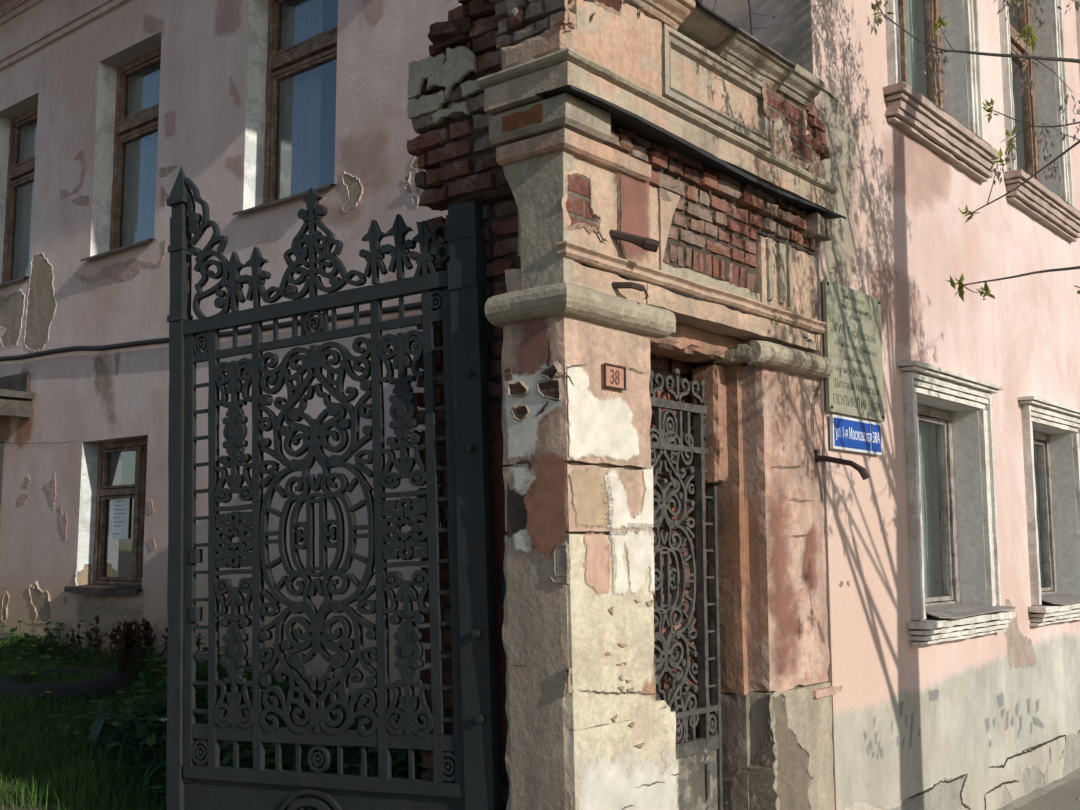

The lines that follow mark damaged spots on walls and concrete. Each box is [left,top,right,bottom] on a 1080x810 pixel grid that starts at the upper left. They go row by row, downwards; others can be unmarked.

peeling [407,46,482,124]
flaking render [762,80,815,168]
flaking render [562,169,601,234]
peeling [0,252,57,352]
peeling [504,361,655,606]
peeling [75,562,93,586]
damp [724,491,803,674]
damp [804,529,817,589]
peeling [605,643,650,692]
peeling [1004,598,1036,670]
spalling [730,691,815,810]
crack [906,730,1080,810]